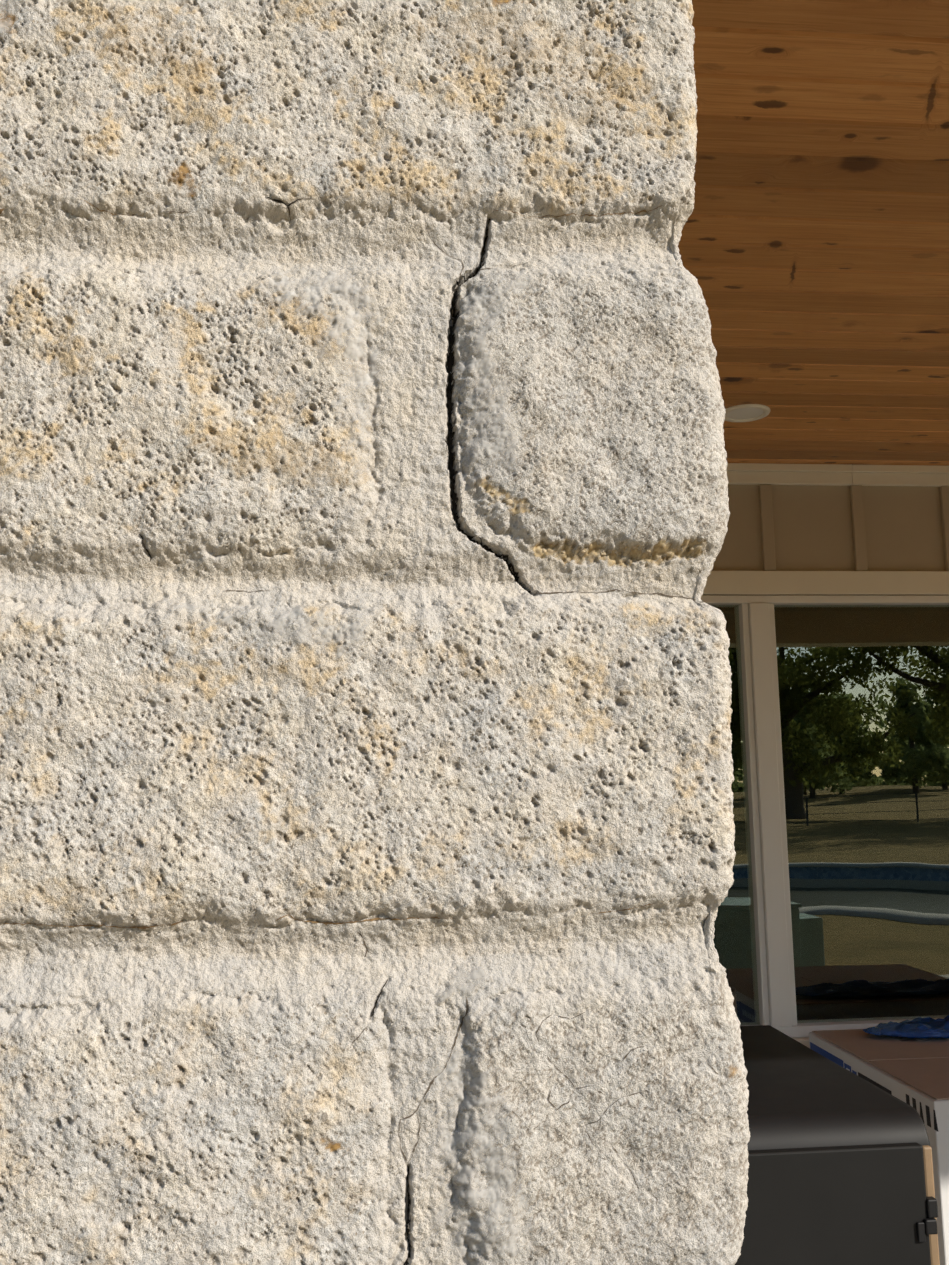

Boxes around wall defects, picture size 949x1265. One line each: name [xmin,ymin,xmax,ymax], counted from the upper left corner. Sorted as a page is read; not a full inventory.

crack [423,205,704,602]
crack [0,921,182,929]
crack [277,915,455,957]
crack [351,979,389,1046]
crack [398,997,469,1265]